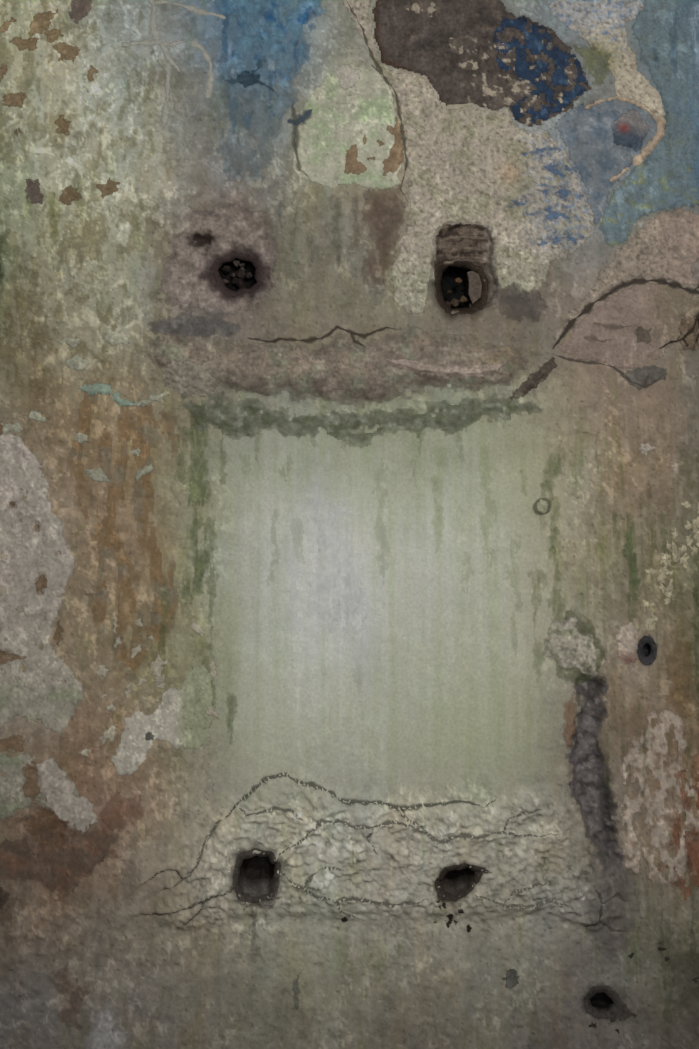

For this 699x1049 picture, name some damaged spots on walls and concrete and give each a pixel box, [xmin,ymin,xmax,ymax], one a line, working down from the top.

spalling [287,0,666,318]
peeling [58,337,166,407]
crack [247,326,397,347]
crack [552,278,699,388]
leakage [184,397,535,504]
leakage [190,518,208,590]
peeling [0,410,98,833]
leakage [560,612,603,685]
peeling [78,654,219,775]
crack [141,773,558,925]
rust [670,772,699,899]
crack [475,881,630,932]